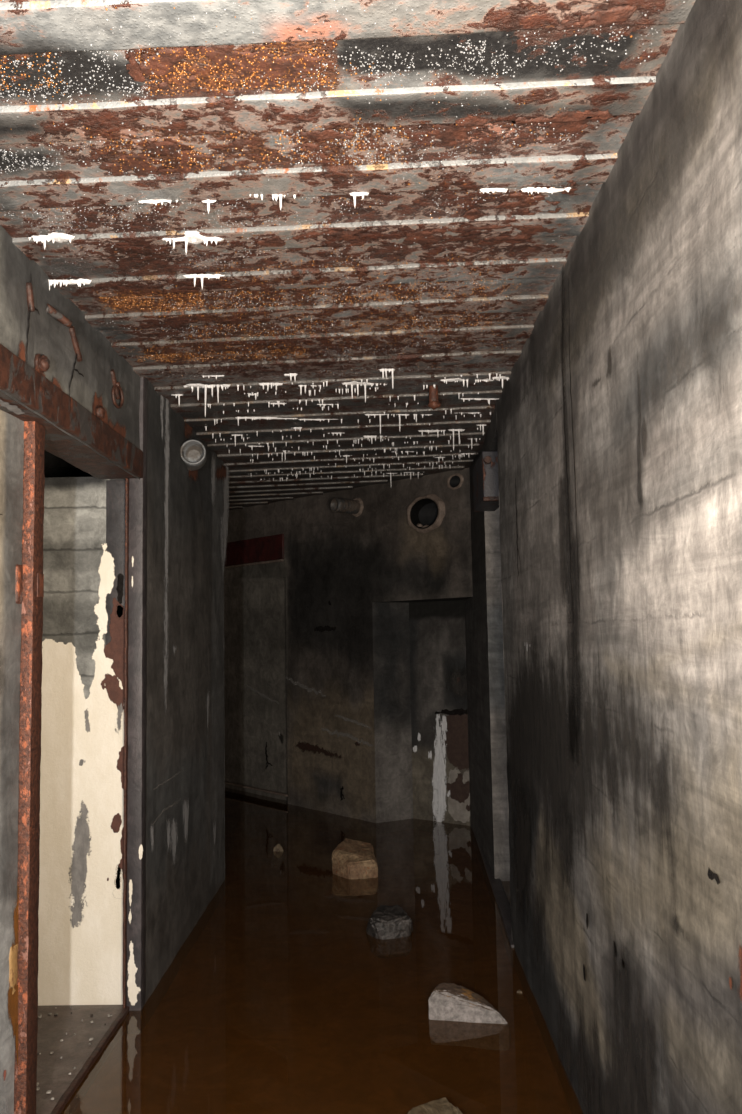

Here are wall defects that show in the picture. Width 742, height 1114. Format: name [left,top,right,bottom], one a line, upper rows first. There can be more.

rust [555,5,637,31]
rust [126,43,327,97]
rust [98,129,354,177]
rust [426,109,617,147]
rust [255,180,579,247]
leakage [506,266,674,950]
peeling [38,543,141,1006]
peeling [446,767,470,823]
leakage [558,951,656,1114]